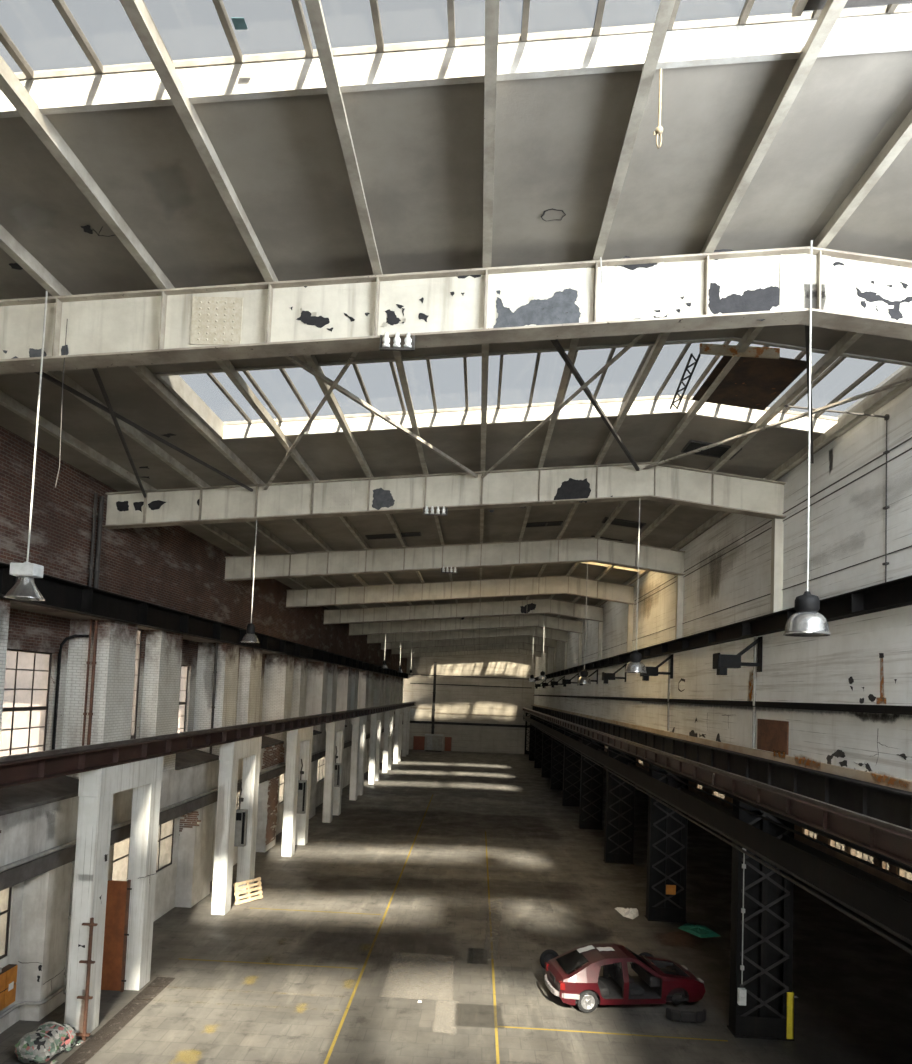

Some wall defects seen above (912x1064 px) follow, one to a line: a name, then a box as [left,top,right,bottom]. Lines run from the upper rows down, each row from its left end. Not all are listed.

peeling [291,307,333,332]
peeling [381,297,428,326]
peeling [493,288,587,328]
peeling [708,280,796,321]
peeling [856,280,912,320]
peeling [115,500,166,512]
peeling [372,488,397,510]
peeling [554,478,591,504]
rust [876,653,886,704]
peeling [826,749,872,772]